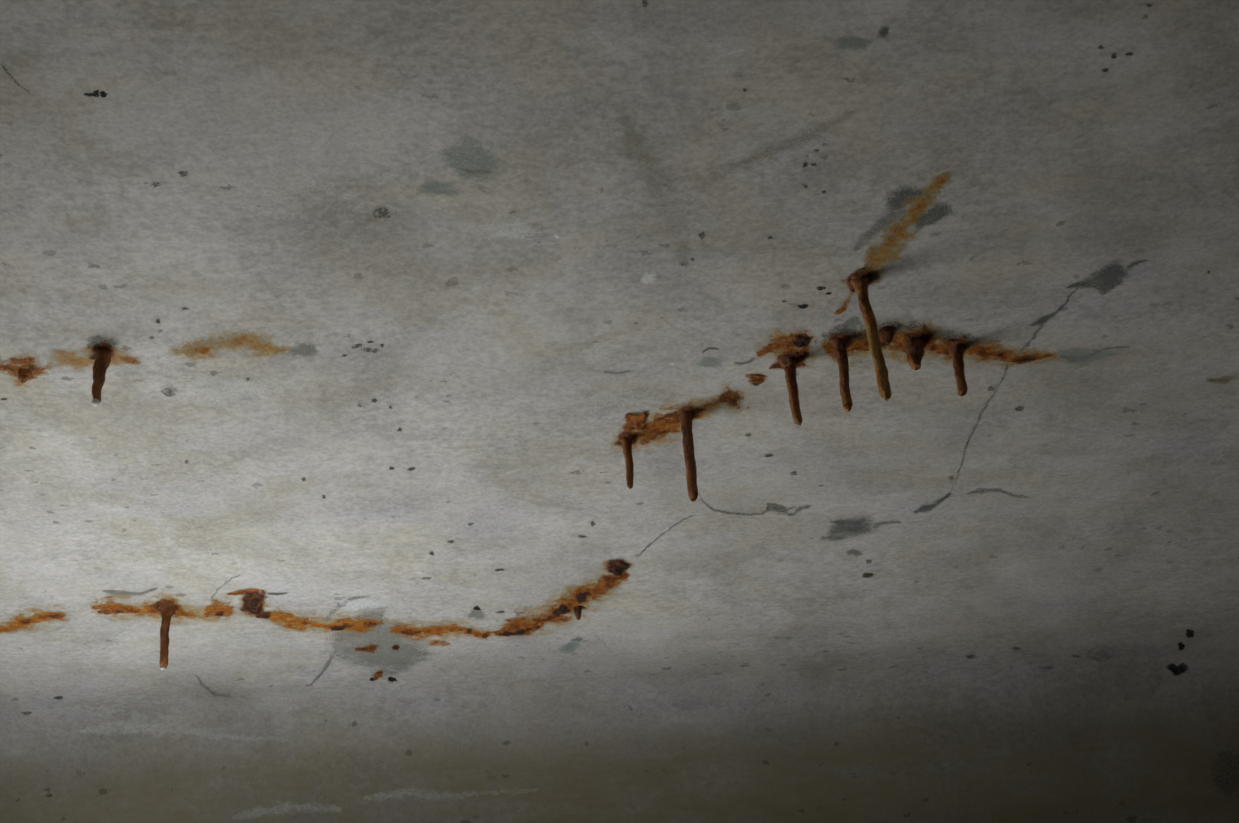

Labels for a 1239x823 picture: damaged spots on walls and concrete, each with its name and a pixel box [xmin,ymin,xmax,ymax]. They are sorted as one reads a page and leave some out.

corrosion [0,335,140,394]
corrosion [168,327,319,364]
corrosion [608,171,1060,460]
crack [944,288,1078,499]
corrosion [0,603,74,637]
corrosion [89,558,636,653]